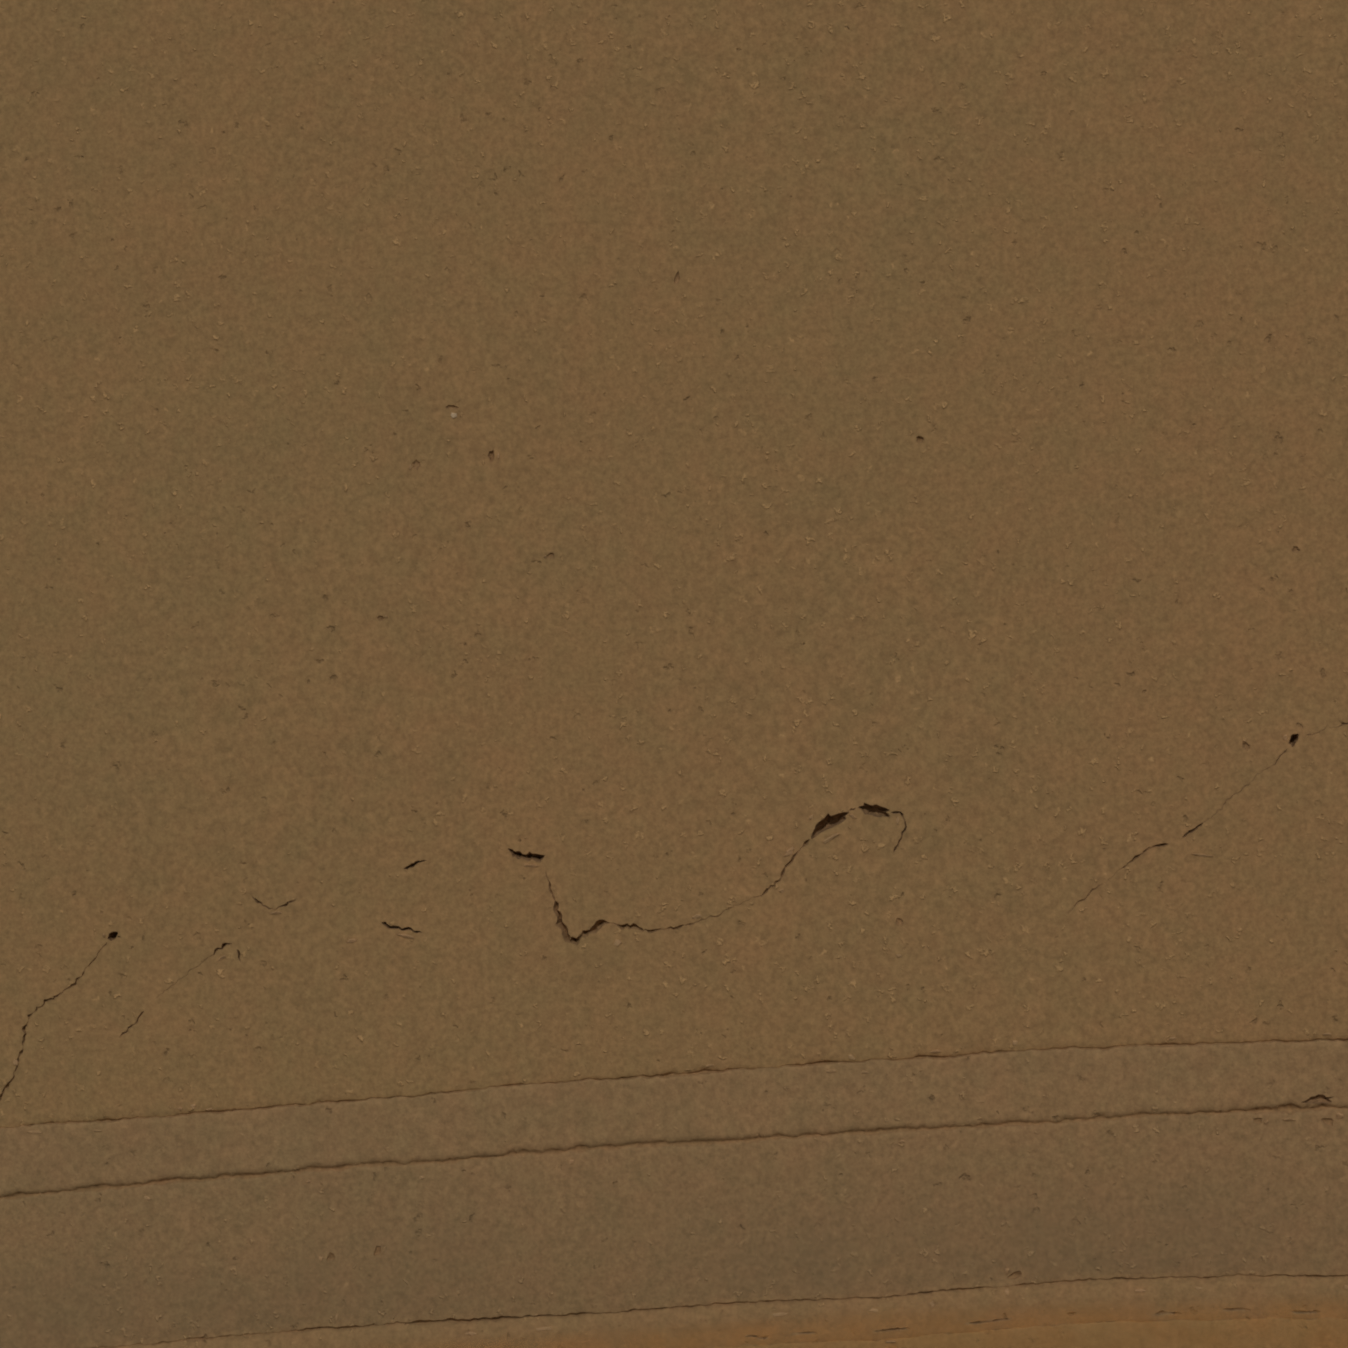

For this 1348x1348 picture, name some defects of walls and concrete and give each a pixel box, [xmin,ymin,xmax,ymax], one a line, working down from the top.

crack [252,896,295,914]
crack [508,803,907,946]
crack [1067,723,1348,914]
crack [0,931,1348,1134]
crack [90,1273,1348,1348]